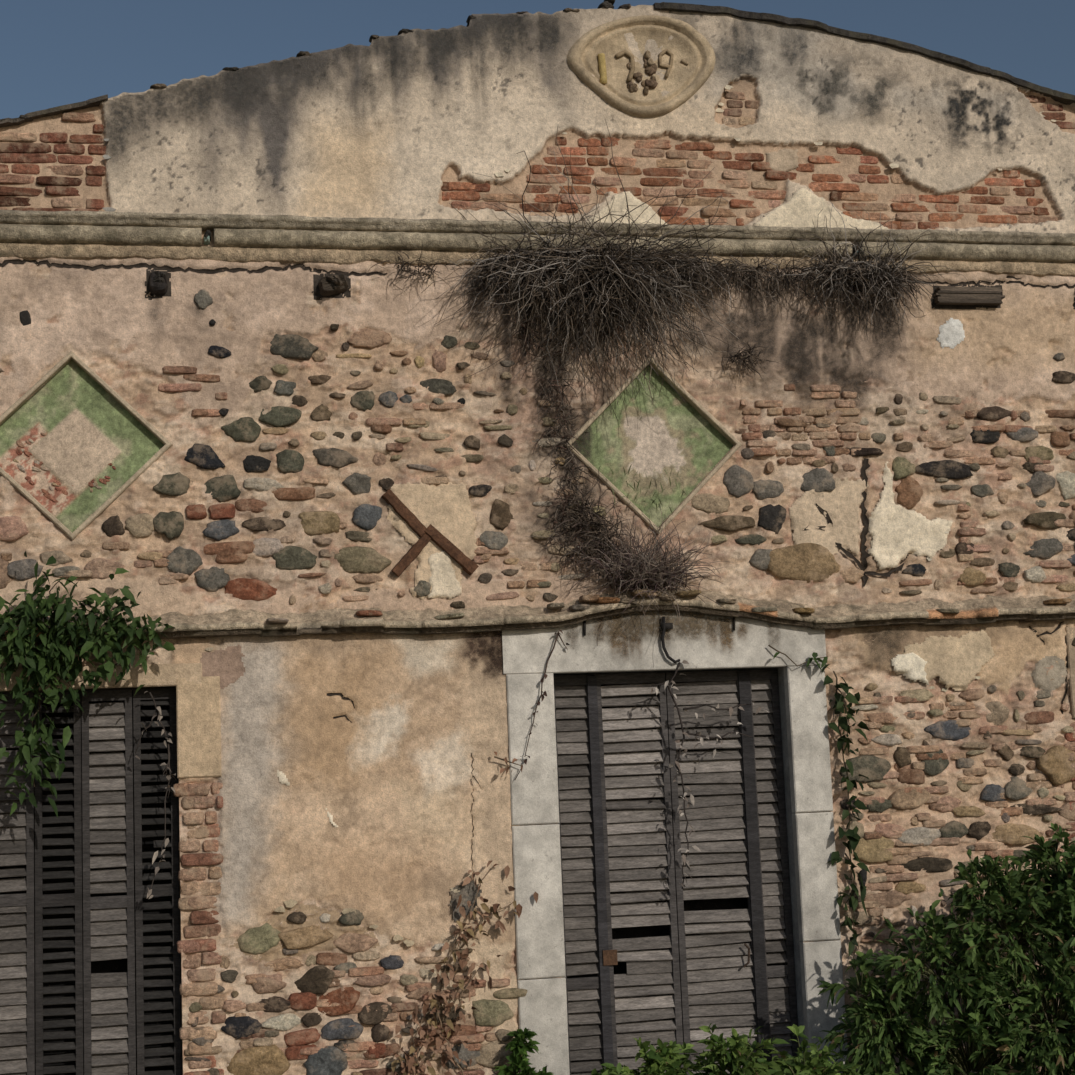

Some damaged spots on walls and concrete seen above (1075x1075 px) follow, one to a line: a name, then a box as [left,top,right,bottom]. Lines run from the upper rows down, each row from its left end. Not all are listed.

spalling [0,104,116,212]
spalling [438,76,1062,238]
damp [949,83,1011,140]
crack [0,259,387,276]
damp [714,284,900,397]
damp [502,293,618,545]
crack [804,458,912,587]
crack [327,693,355,722]
peeling [891,630,995,692]